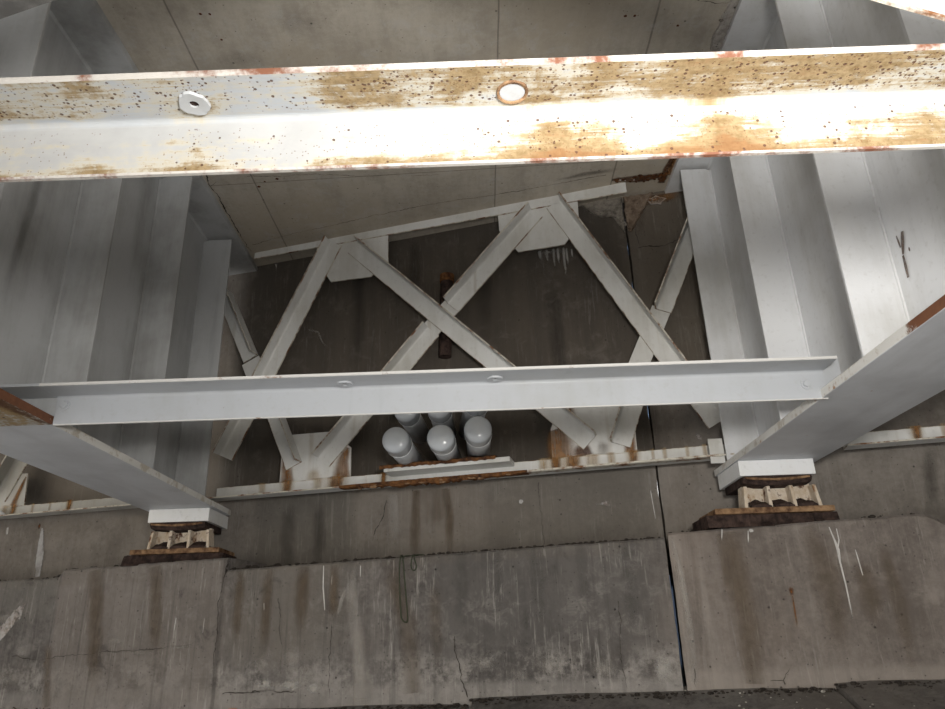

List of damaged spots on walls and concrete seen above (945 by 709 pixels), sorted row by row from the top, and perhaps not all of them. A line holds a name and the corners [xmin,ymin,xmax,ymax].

spalling [709,0,739,52]
rust [612,158,677,203]
rust [282,463,292,491]
rust [331,429,723,537]